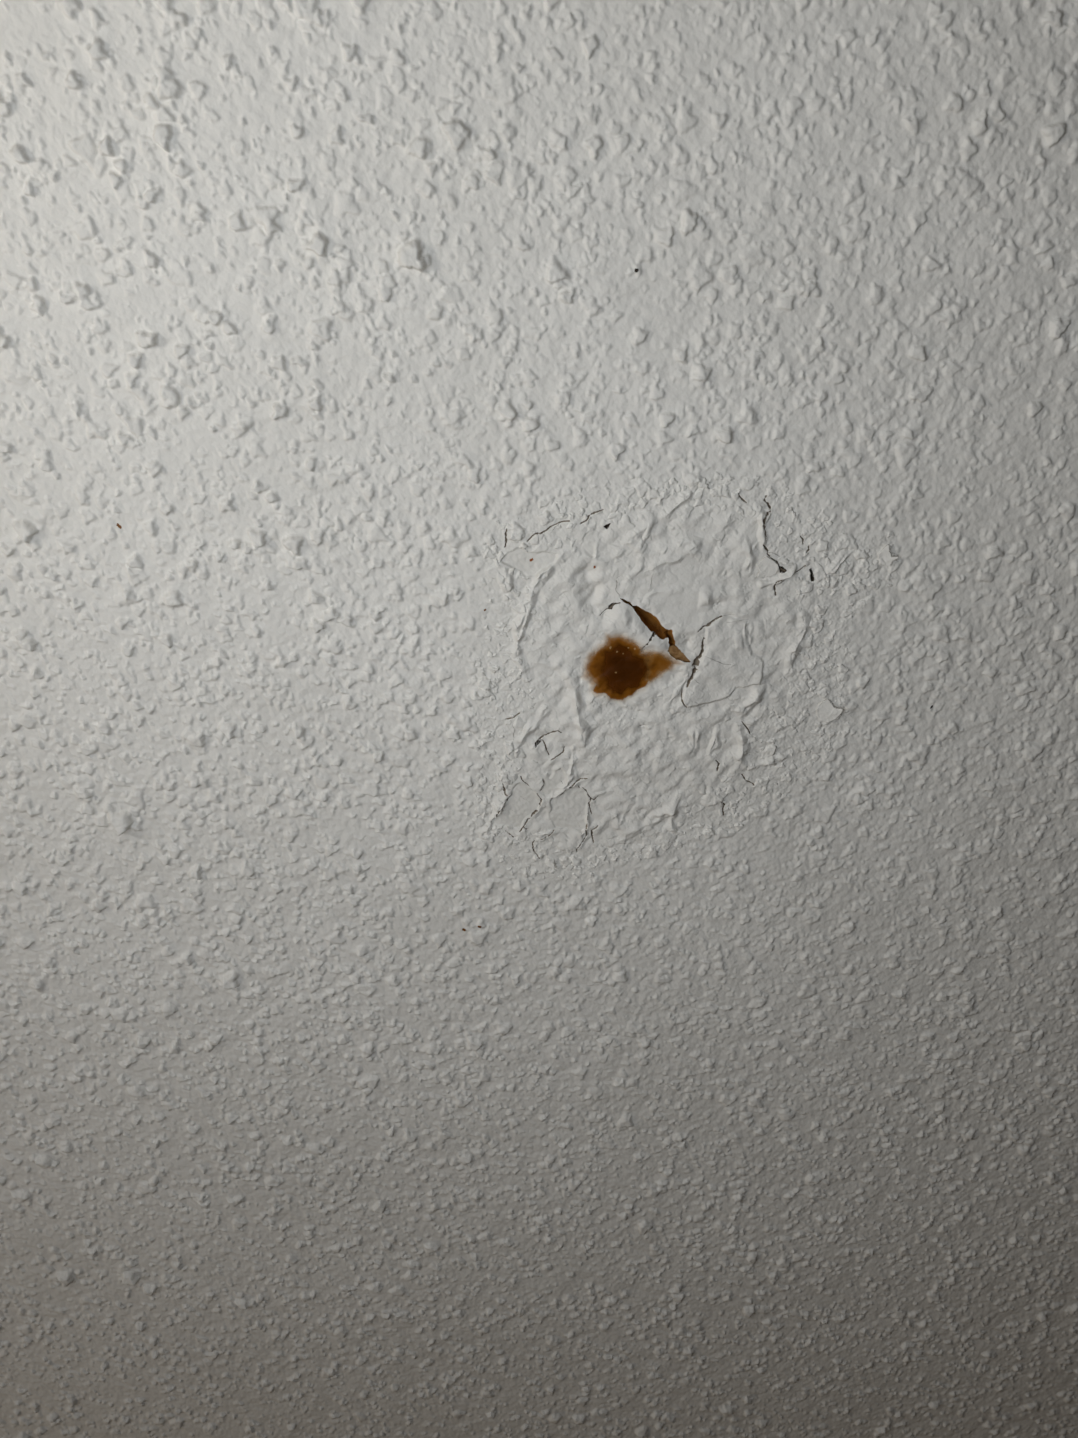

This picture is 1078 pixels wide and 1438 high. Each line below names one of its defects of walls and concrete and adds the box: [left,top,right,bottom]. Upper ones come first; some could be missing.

crack [504,509,603,547]
crack [738,493,810,596]
crack [600,572,743,708]
crack [507,713,565,760]
crack [716,761,755,815]